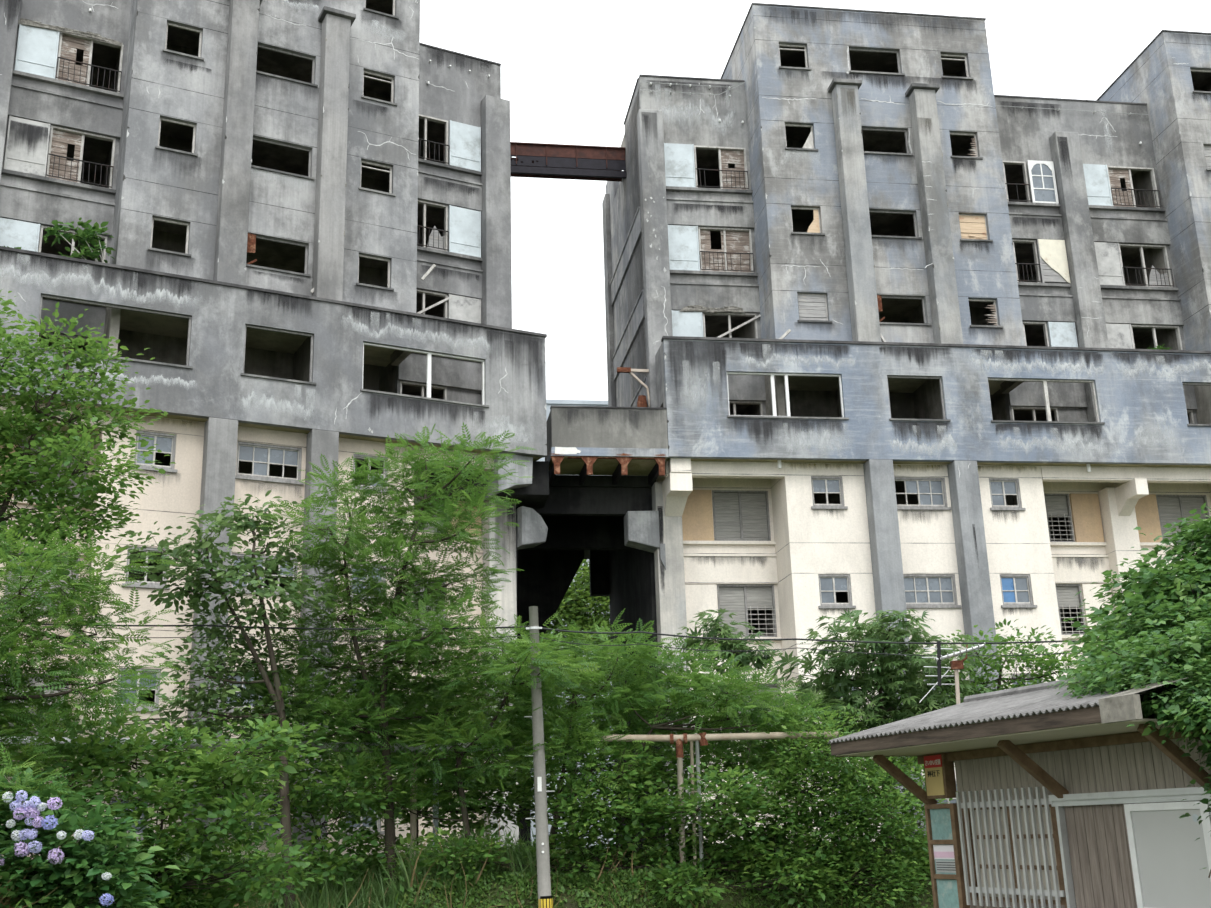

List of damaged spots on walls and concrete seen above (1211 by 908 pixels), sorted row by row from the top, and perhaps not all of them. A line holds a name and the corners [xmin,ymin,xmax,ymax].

crack [358,131,416,160]
leakage [0,250,192,303]
leakage [248,290,310,310]
leakage [353,306,542,379]
leakage [879,346,948,363]
leakage [972,349,1211,375]
leakage [87,368,192,386]
leakage [243,391,310,414]
leakage [371,394,521,442]
leakage [893,421,953,451]
leakage [996,424,1101,449]